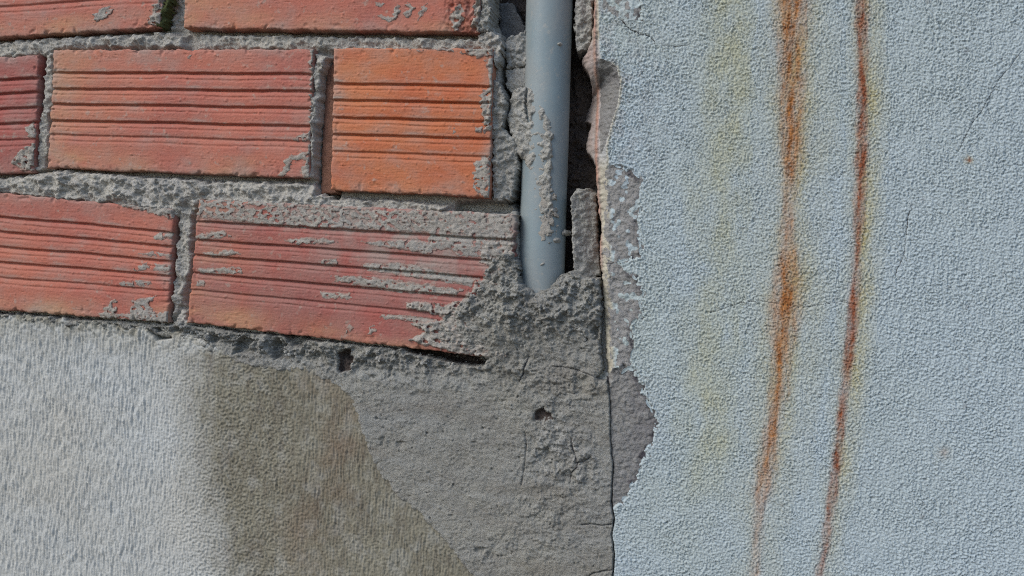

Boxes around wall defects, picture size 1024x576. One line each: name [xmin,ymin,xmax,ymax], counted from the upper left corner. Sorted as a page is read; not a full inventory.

flaking render [598,59,620,152]
peeling [602,0,643,25]
peeling [602,160,658,507]
rust [725,0,892,576]
leakage [160,343,473,576]
spalling [535,417,591,484]